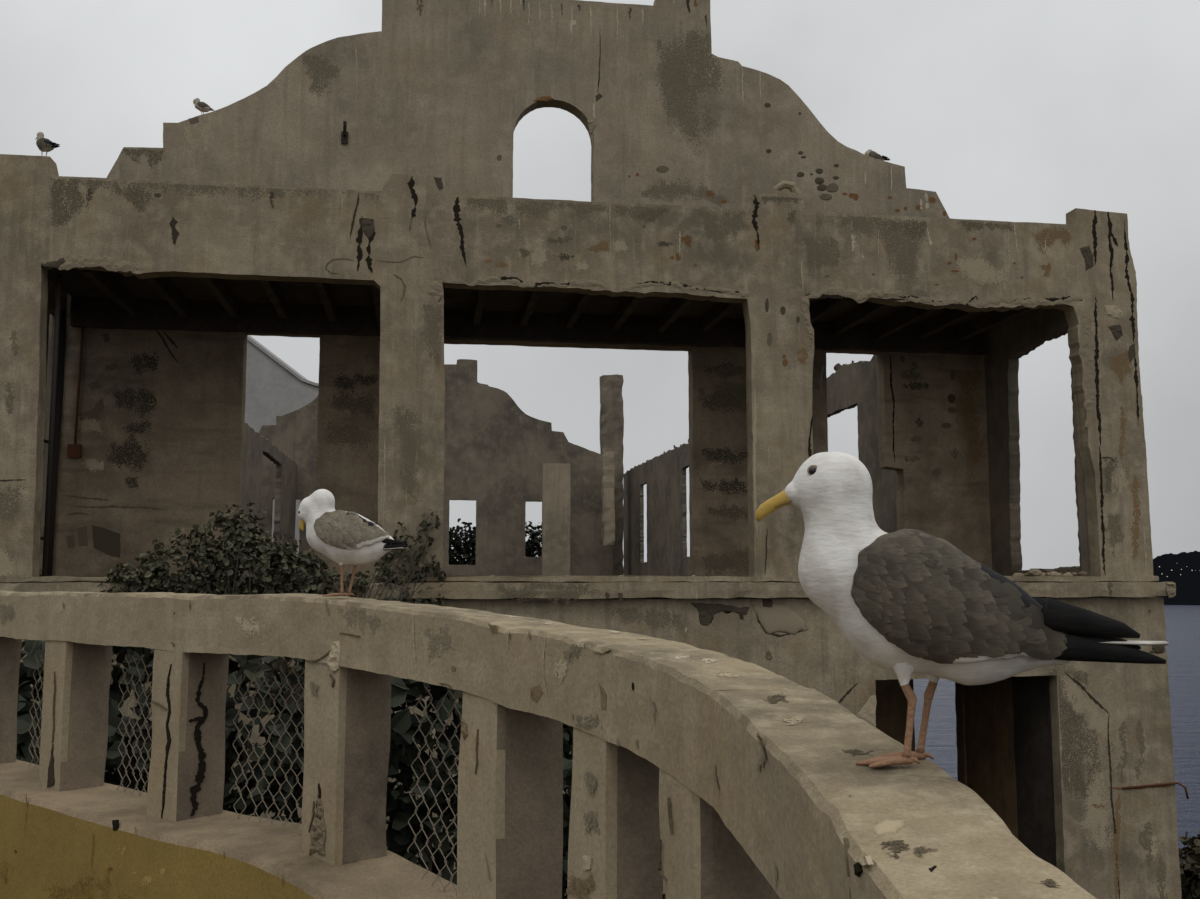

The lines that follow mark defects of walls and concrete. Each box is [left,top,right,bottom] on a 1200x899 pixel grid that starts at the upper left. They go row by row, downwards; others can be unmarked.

spalling [36,254,147,272]
crack [325,176,570,300]
crack [1014,210,1139,575]
crack [151,642,208,818]
peeling [112,820,177,886]
spalling [309,794,327,855]